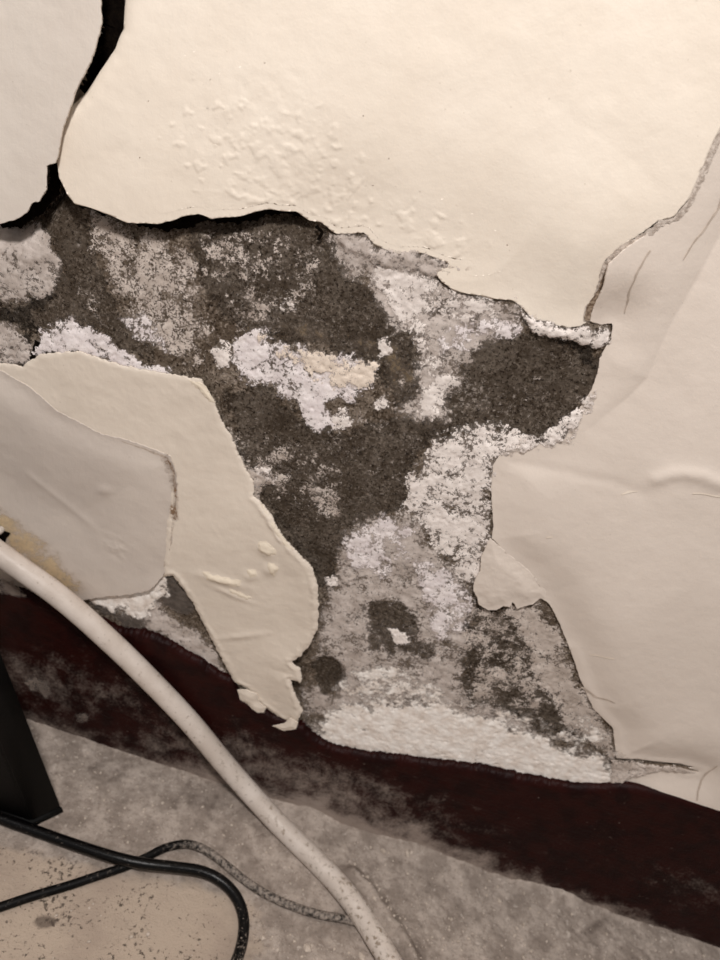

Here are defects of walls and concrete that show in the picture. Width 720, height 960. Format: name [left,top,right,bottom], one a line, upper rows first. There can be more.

crack [80,0,125,94]
water stain [0,184,626,783]
peeling [0,0,696,783]
crack [584,130,720,322]